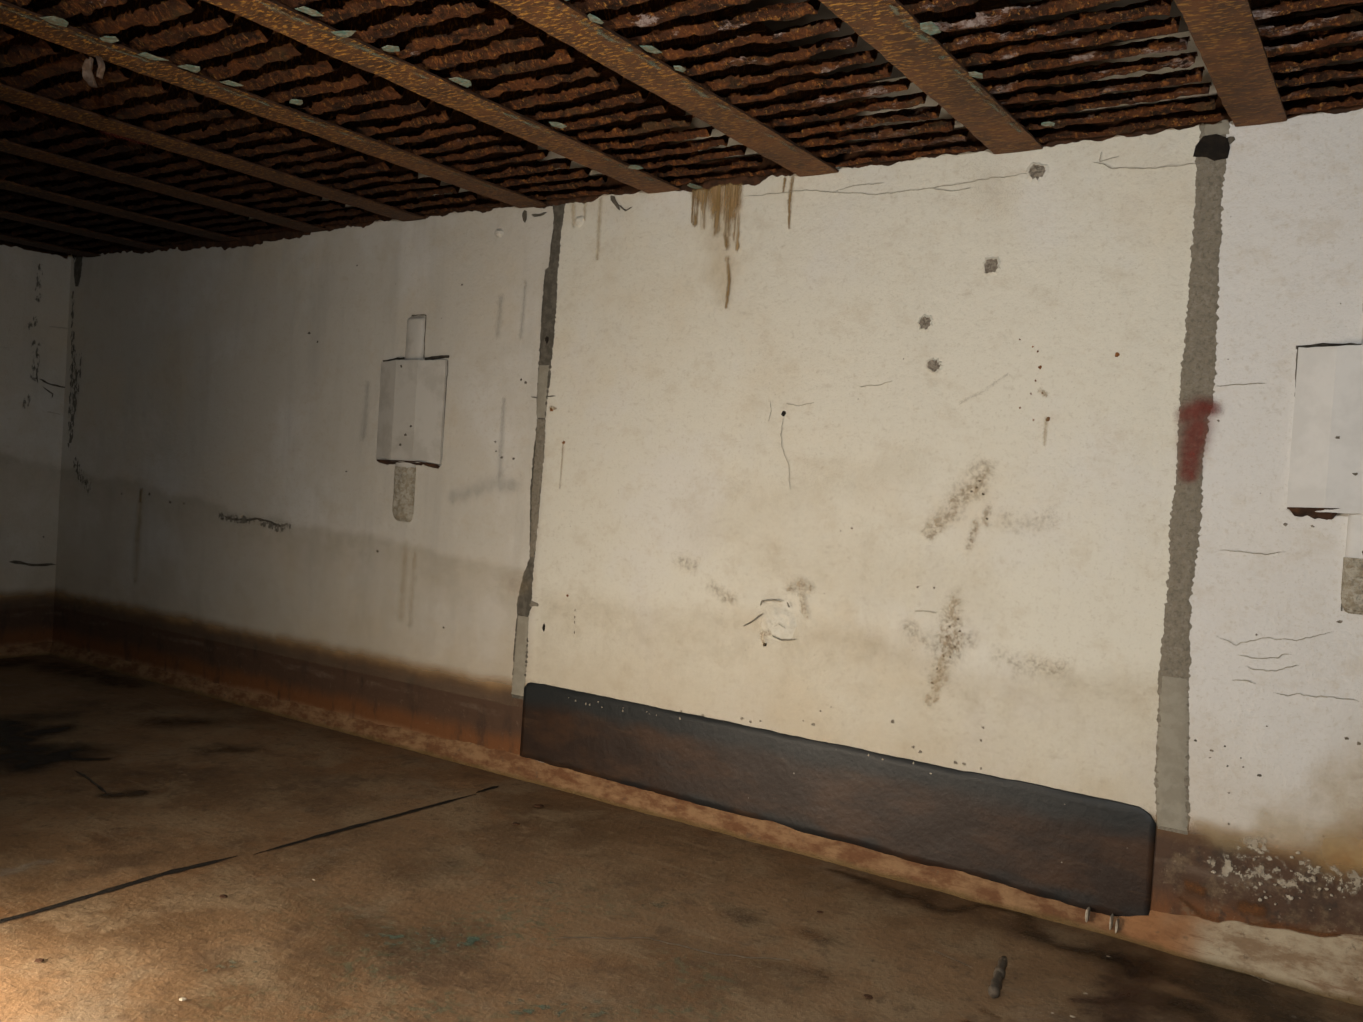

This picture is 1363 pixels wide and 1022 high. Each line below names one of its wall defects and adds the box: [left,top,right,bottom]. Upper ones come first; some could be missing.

peeling [0,6,270,106]
peeling [256,0,400,62]
peeling [415,73,653,181]
rust [821,128,988,168]
rust [1028,96,1232,147]
rust [1282,79,1363,119]
rust [665,156,794,308]
leakage [0,591,538,761]
crack [74,770,146,797]
crack [0,786,498,923]
leakage [1150,821,1363,937]
leakage [829,869,1318,1022]